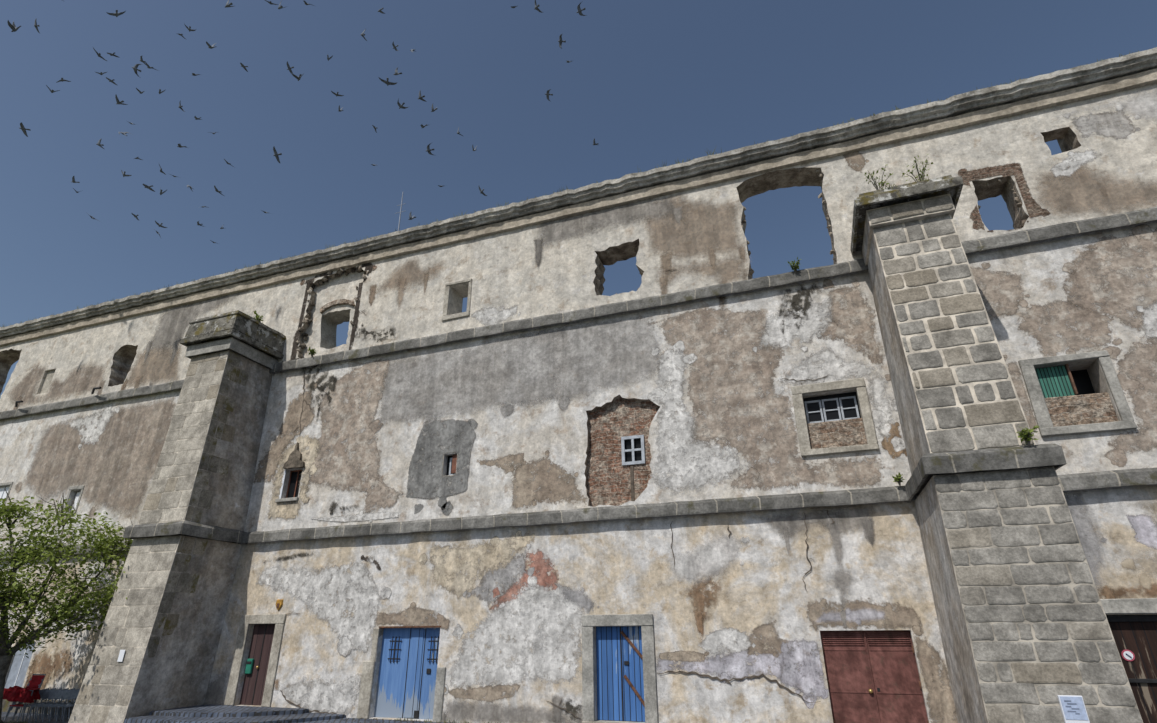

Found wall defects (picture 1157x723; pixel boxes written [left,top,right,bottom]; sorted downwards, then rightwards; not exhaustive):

flaking render [1051,89,1157,177]
spalling [958,163,1050,232]
spalling [289,263,394,361]
flaking render [253,279,907,522]
flaking render [970,224,1157,467]
crack [802,510,835,591]
flaking render [256,530,599,703]
flaking render [656,598,958,723]